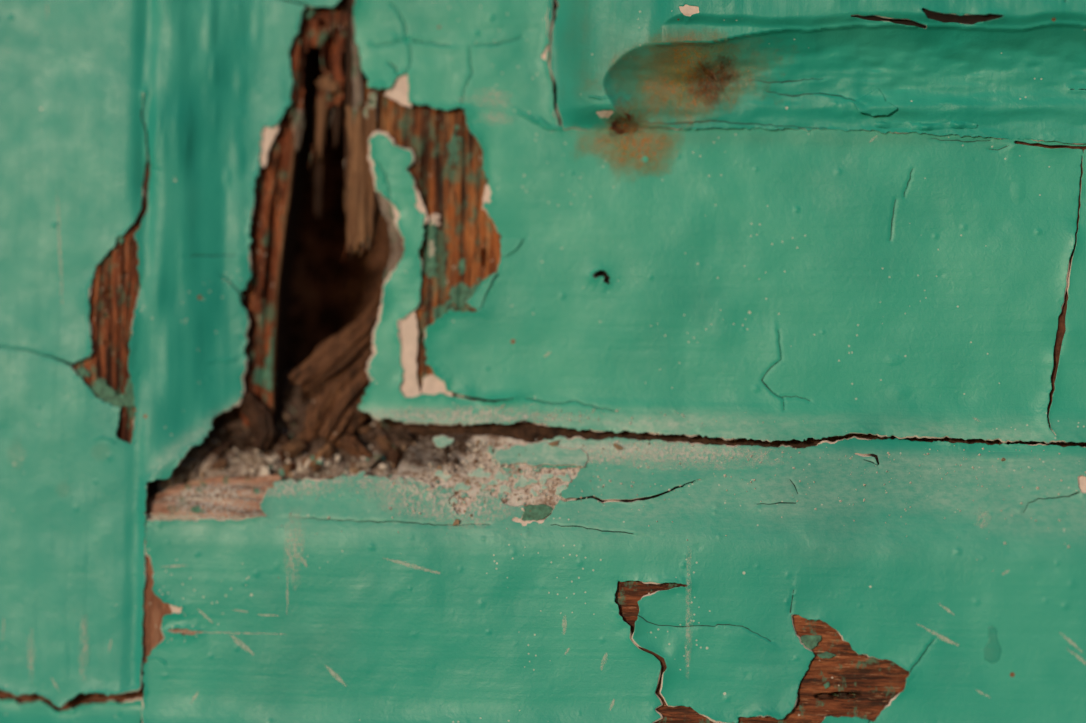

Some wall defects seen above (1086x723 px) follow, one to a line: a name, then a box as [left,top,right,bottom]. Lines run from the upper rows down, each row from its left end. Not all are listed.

peeling [364,92,377,122]
crack [550,0,561,126]
peeling [73,226,140,443]
peeling [466,273,497,310]
crack [931,138,1086,428]
peeling [452,392,514,402]
peeling [390,434,589,525]
peeling [142,556,203,671]
peeling [615,581,687,633]
peeling [654,697,714,723]
peeling [738,615,910,723]